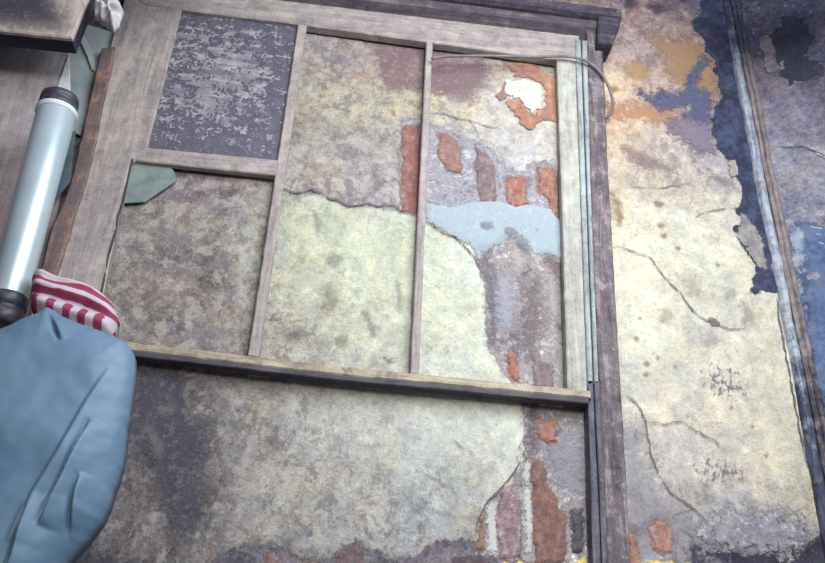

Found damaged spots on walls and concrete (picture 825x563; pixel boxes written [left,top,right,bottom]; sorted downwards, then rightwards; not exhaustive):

peeling [496,62,556,129]
crack [284,188,401,211]
spalling [396,117,560,219]
spalling [475,227,564,388]
crack [612,245,743,330]
spalling [213,402,589,563]
crack [476,436,527,531]
crack [628,396,726,545]
spalling [629,515,677,563]